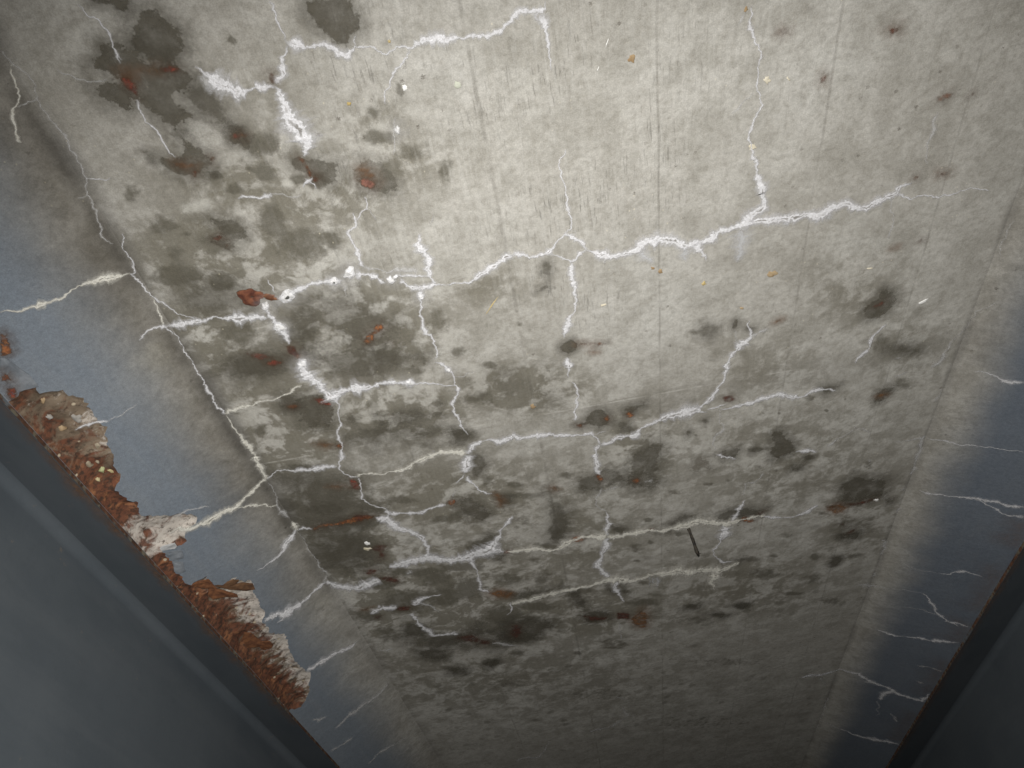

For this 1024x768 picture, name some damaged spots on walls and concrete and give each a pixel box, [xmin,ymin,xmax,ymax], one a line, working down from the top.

leakage [306,0,360,44]
leakage [92,9,250,178]
leakage [210,218,248,250]
crack [4,3,987,643]
leakage [559,339,577,354]
leakage [279,394,334,428]
crack [911,438,1021,518]
spalling [0,357,311,710]
rust [584,611,647,628]
crack [307,642,356,671]
crack [801,669,929,707]
crack [841,729,897,744]